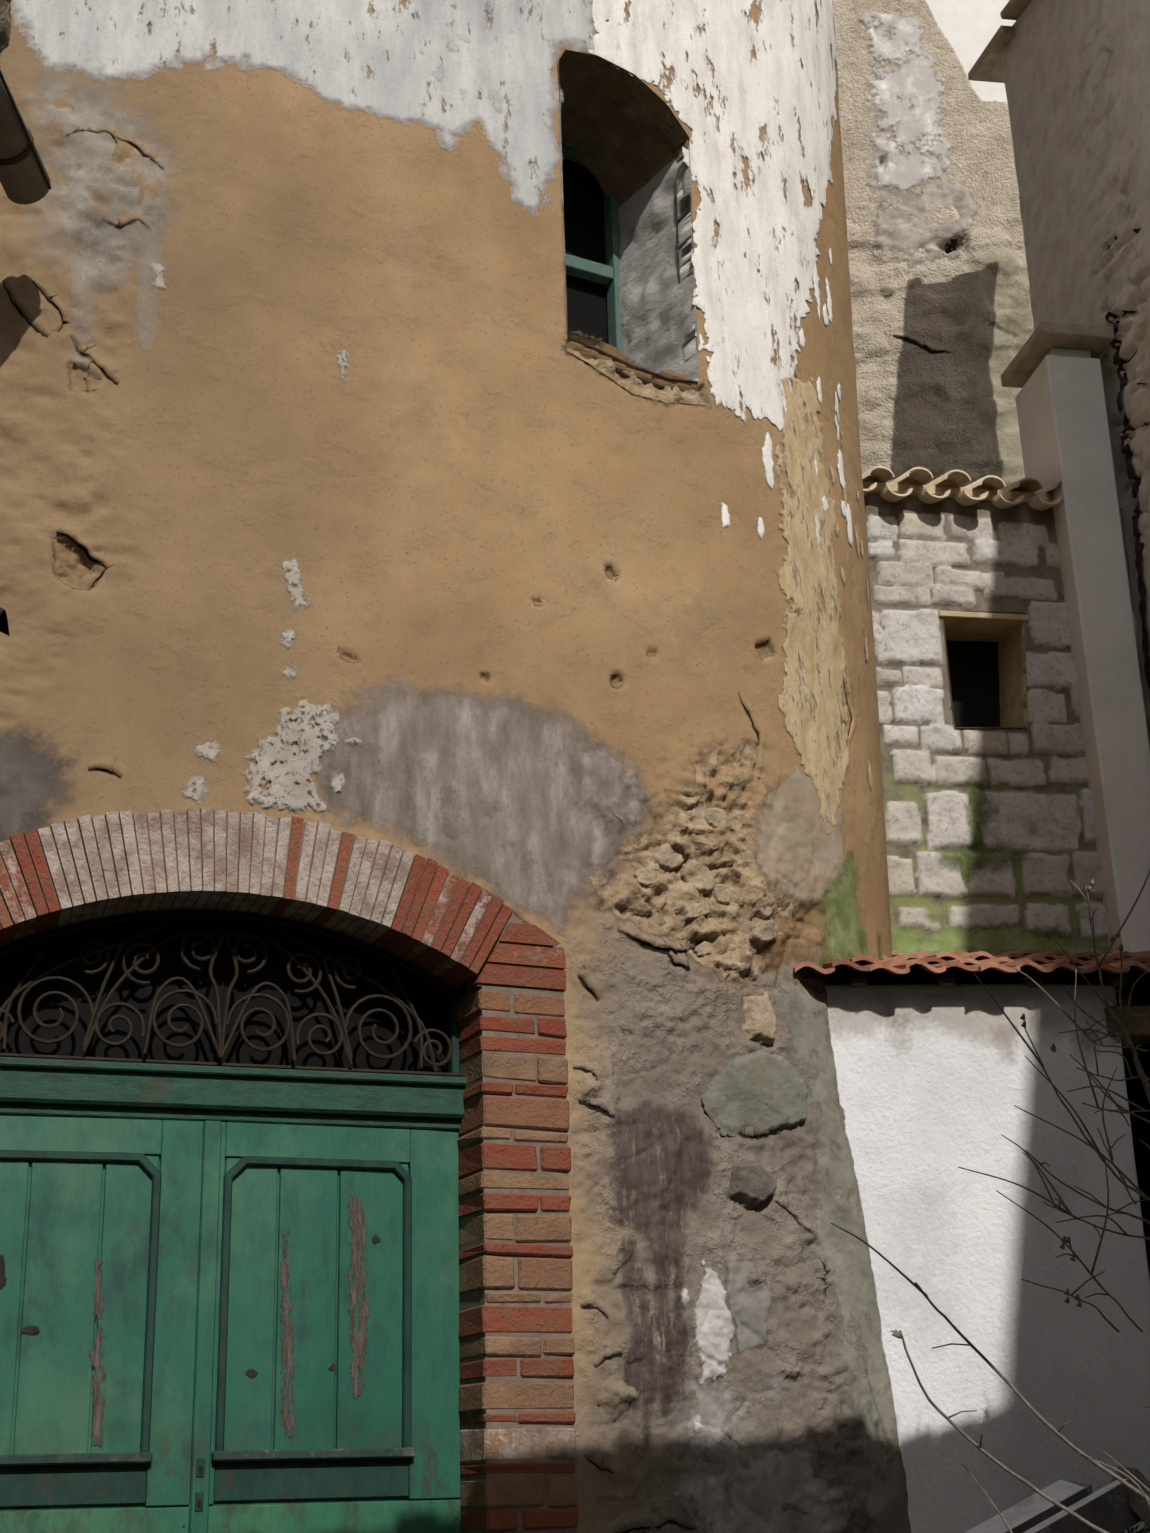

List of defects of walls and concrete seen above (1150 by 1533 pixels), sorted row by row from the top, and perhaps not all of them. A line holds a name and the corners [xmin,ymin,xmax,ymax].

peeling [859,11,980,267]
crack [893,330,952,354]
peeling [13,0,864,1136]
damp [0,734,68,840]
crack [579,1295,631,1407]
flaking render [682,1261,734,1384]
damp [611,1103,854,1533]
crack [584,1448,614,1473]
flaking render [692,1415,703,1433]
crack [604,1508,712,1533]